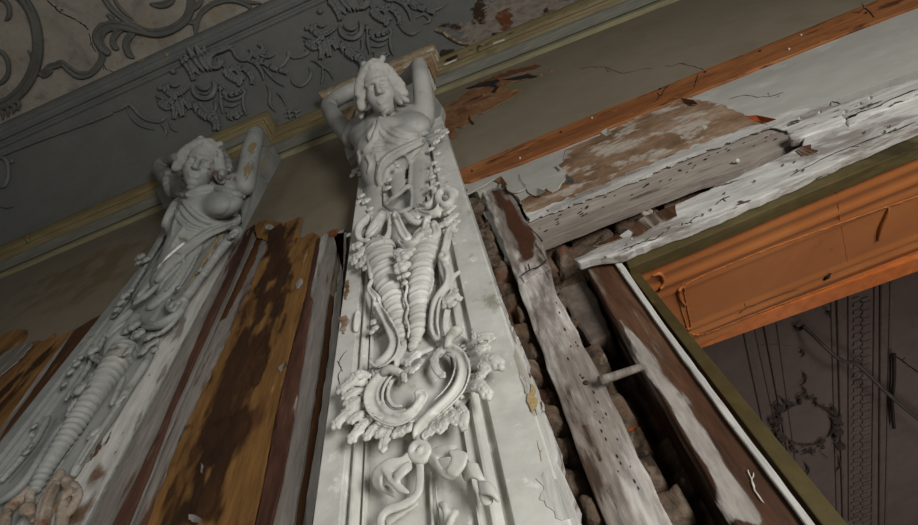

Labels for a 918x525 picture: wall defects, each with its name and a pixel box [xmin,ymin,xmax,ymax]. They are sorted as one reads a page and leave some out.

flaking render [443,72,537,139]
flaking render [435,0,588,66]
flaking render [467,79,918,261]
spalling [492,274,582,525]